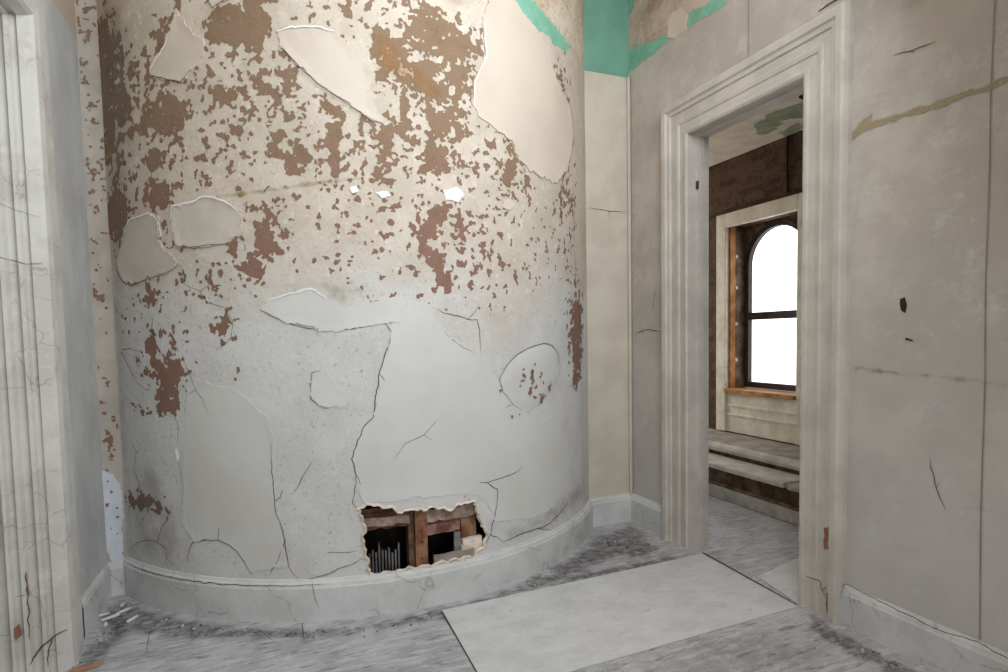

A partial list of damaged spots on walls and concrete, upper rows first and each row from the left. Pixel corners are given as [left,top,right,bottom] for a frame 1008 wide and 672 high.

peeling [628,0,726,71]
crack [175,265,233,349]
peeling [76,0,584,576]
crack [437,307,481,352]
crack [351,323,391,508]
crack [499,343,582,411]
crack [131,416,362,637]
crack [480,470,569,543]